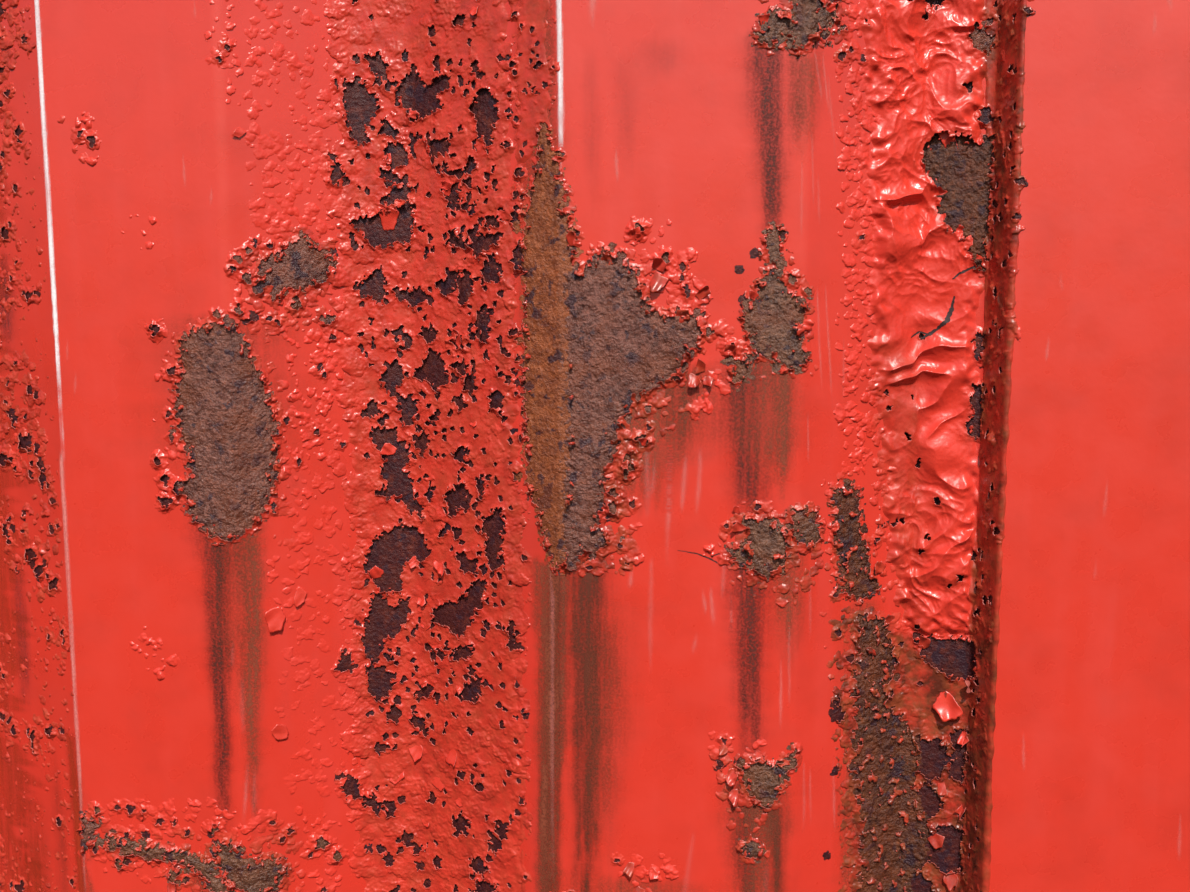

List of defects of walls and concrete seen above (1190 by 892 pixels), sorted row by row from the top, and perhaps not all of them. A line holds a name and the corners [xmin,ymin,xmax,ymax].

peeling [0,0,85,892]
corrosion [68,303,353,892]
corrosion [227,230,338,311]
peeling [317,0,559,892]
corrosion [510,0,977,892]